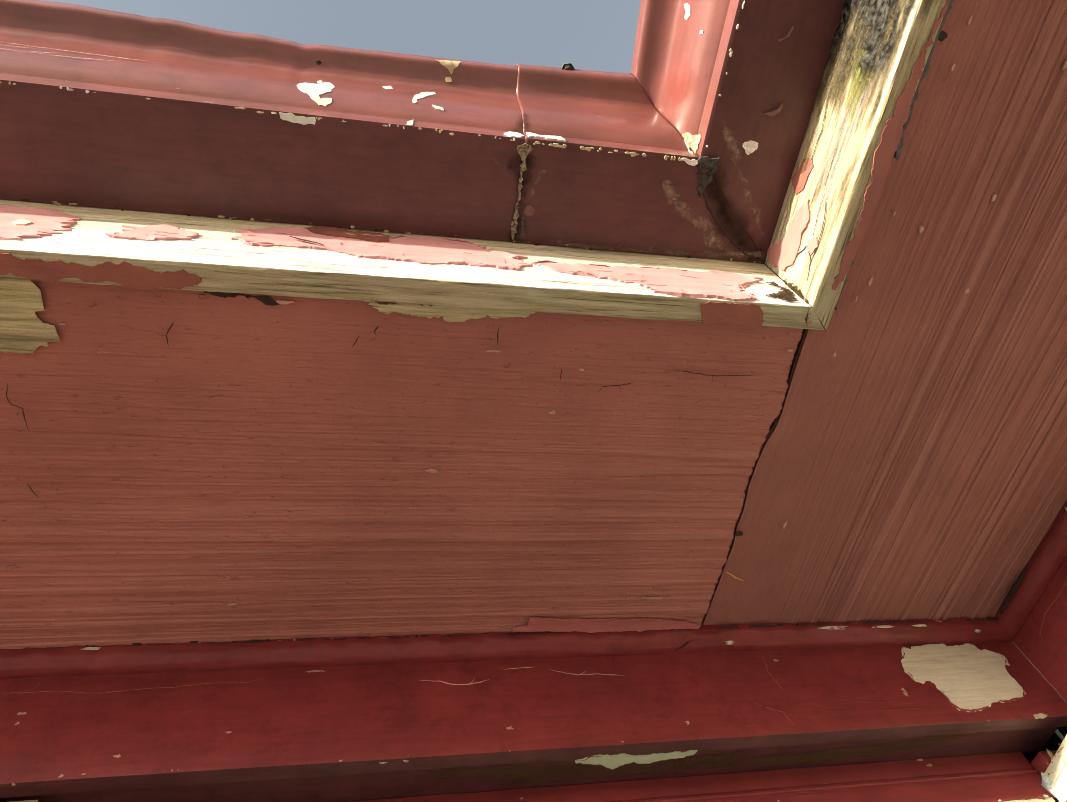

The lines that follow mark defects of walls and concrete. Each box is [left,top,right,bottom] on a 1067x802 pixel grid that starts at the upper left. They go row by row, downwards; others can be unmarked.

peeling [234,80,335,125]
damp [801,0,931,196]
peeling [832,0,951,291]
peeling [0,199,202,354]
peeling [218,215,764,327]
peeling [748,159,819,271]
peeling [901,618,1026,721]
peeling [575,737,701,770]